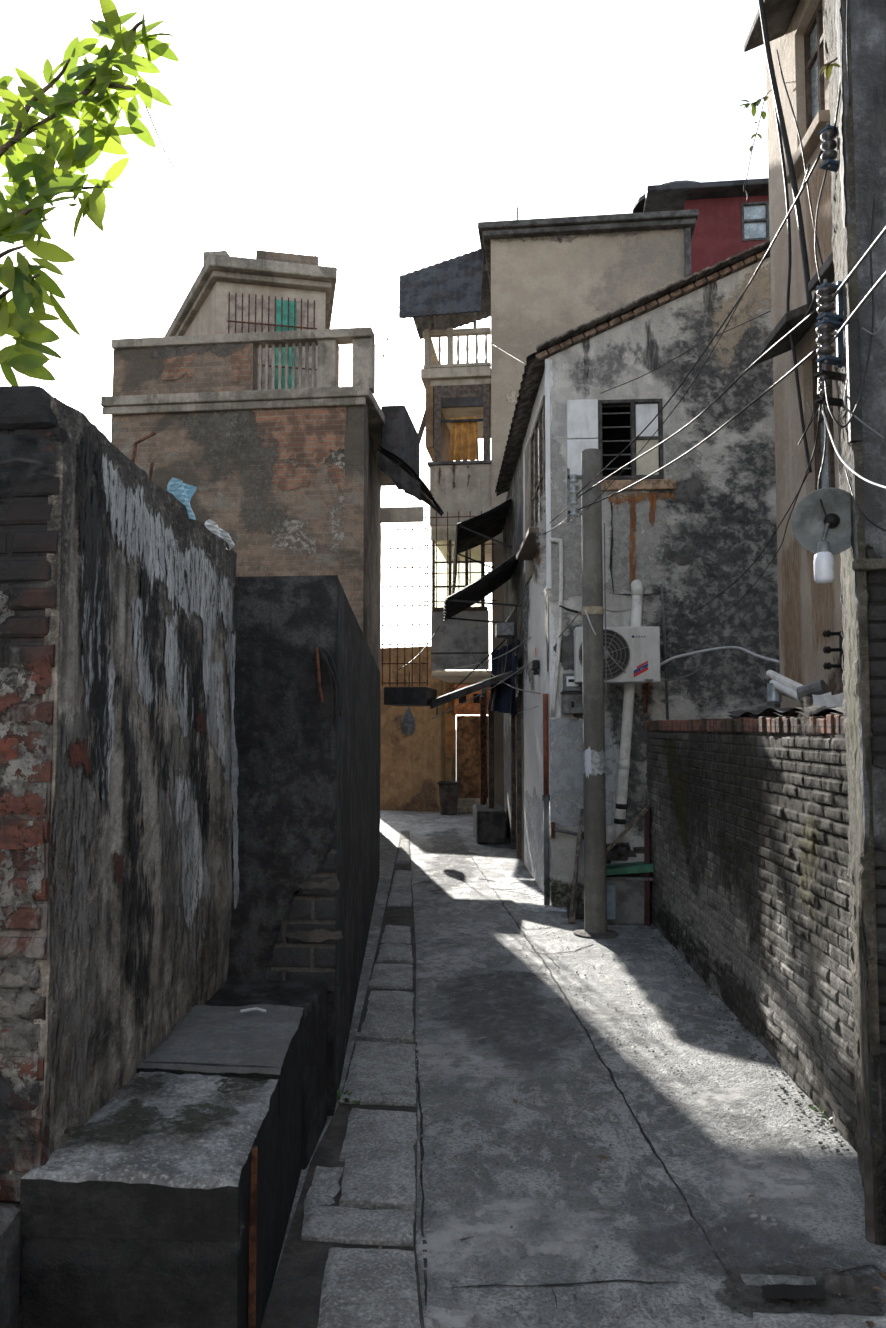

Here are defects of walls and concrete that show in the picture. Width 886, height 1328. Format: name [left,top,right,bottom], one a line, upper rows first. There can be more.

flaking render [0,664,51,931]
flaking render [81,549,115,801]
leakage [75,422,210,1044]
flaking render [101,454,236,930]
leakage [173,409,286,532]
flaking render [216,406,346,557]
rust [608,492,674,587]
leakage [604,280,834,835]
leakage [827,659,843,695]
flaking render [866,545,886,769]
crack [415,1037,668,1316]
crack [455,833,737,1290]